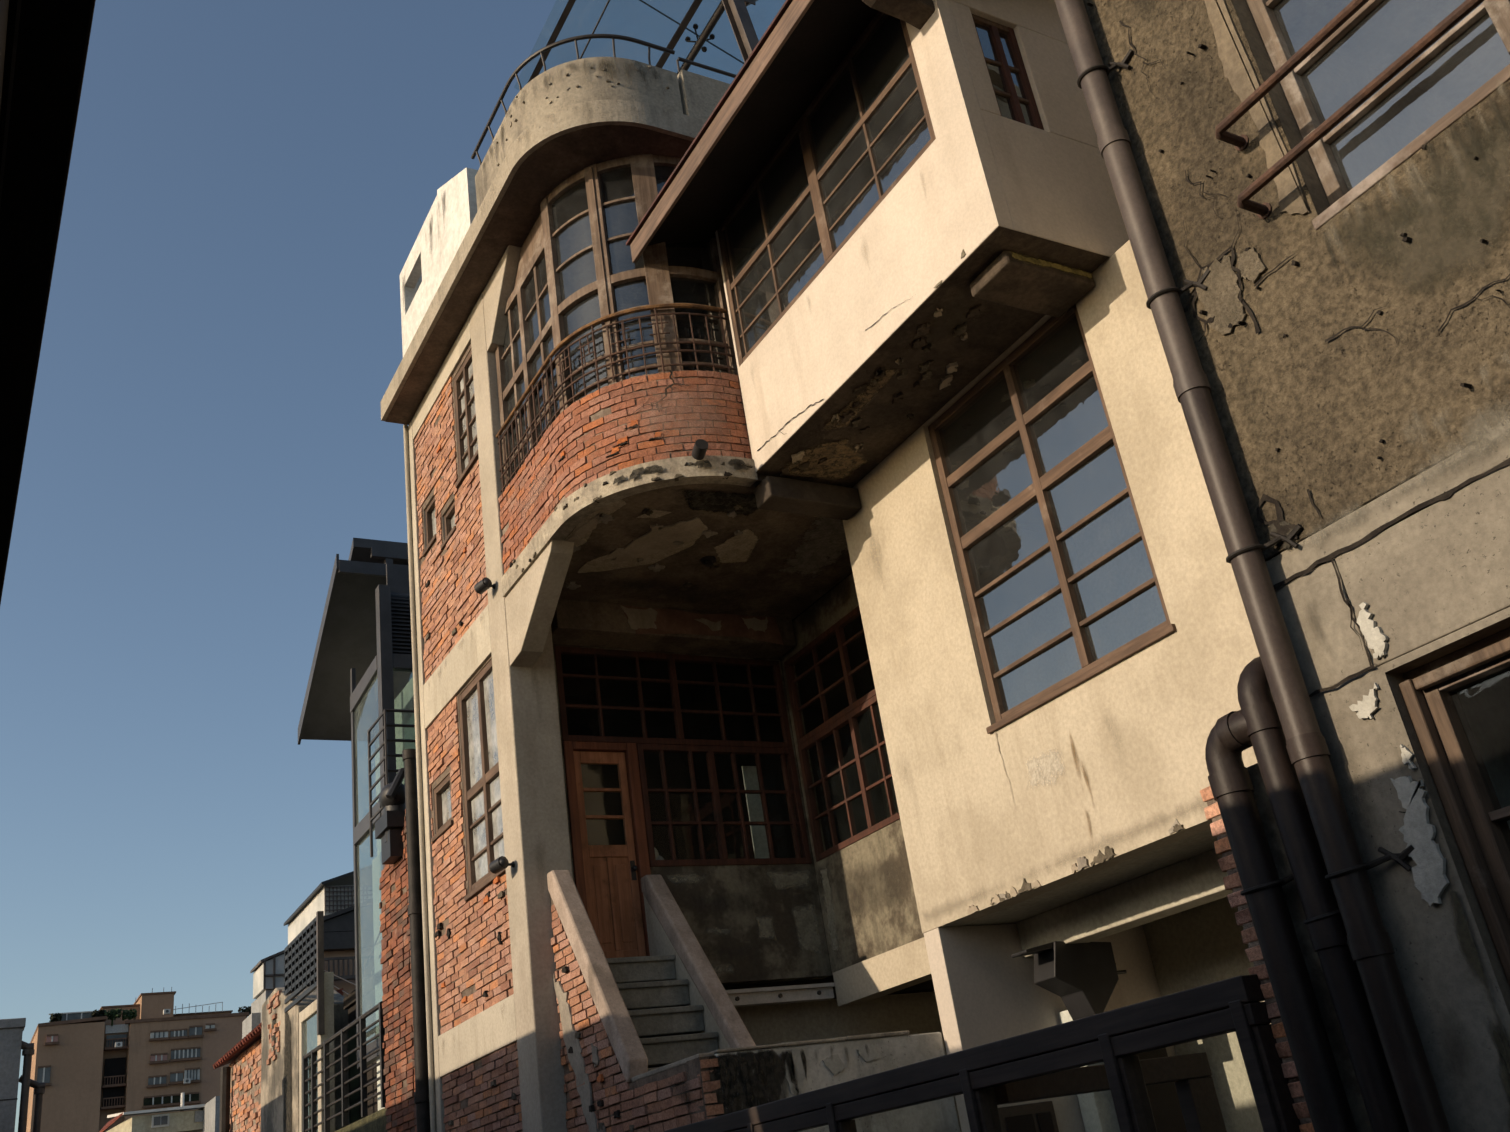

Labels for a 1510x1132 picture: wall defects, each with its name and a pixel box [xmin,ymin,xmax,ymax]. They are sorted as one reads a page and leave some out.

flaking render [1196,247,1267,335]
peeling [554,419,759,590]
peeling [778,517,848,578]
crack [1273,458,1510,697]
peeling [1357,602,1388,659]
peeling [1349,682,1379,719]
peeling [1390,744,1450,907]
water stain [769,868,838,953]